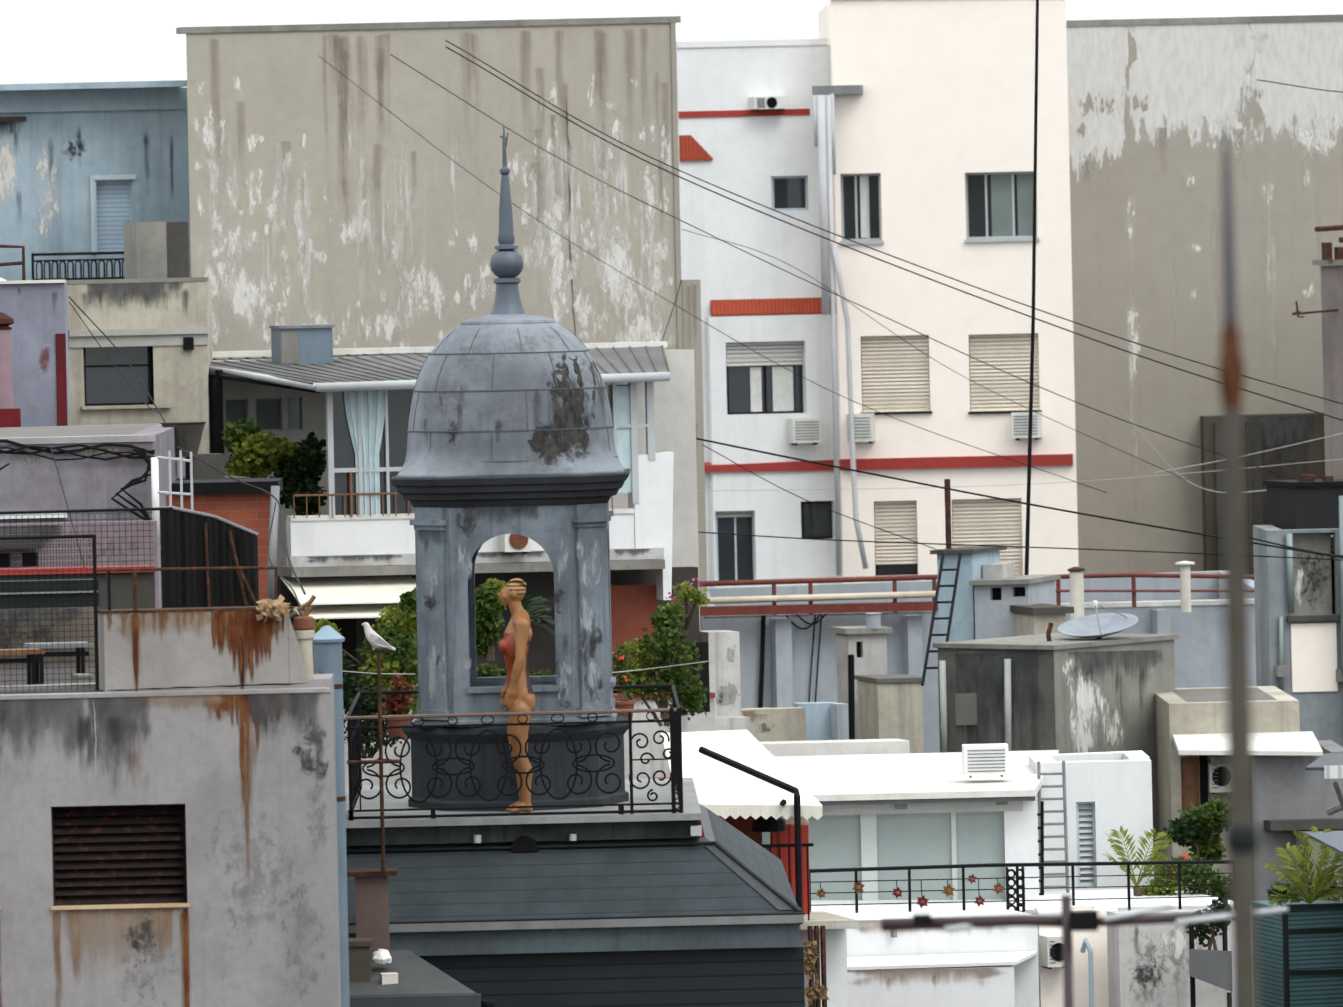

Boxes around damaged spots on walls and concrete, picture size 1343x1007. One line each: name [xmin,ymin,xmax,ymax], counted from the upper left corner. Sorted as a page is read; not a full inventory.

peeling [1066,21,1343,186]
peeling [192,82,494,355]
peeling [508,73,676,350]
water stain [528,354,603,465]
water stain [1069,650,1161,689]
water stain [0,697,148,758]
rust [107,610,289,847]
water stain [249,693,328,776]
rust [53,907,189,1007]